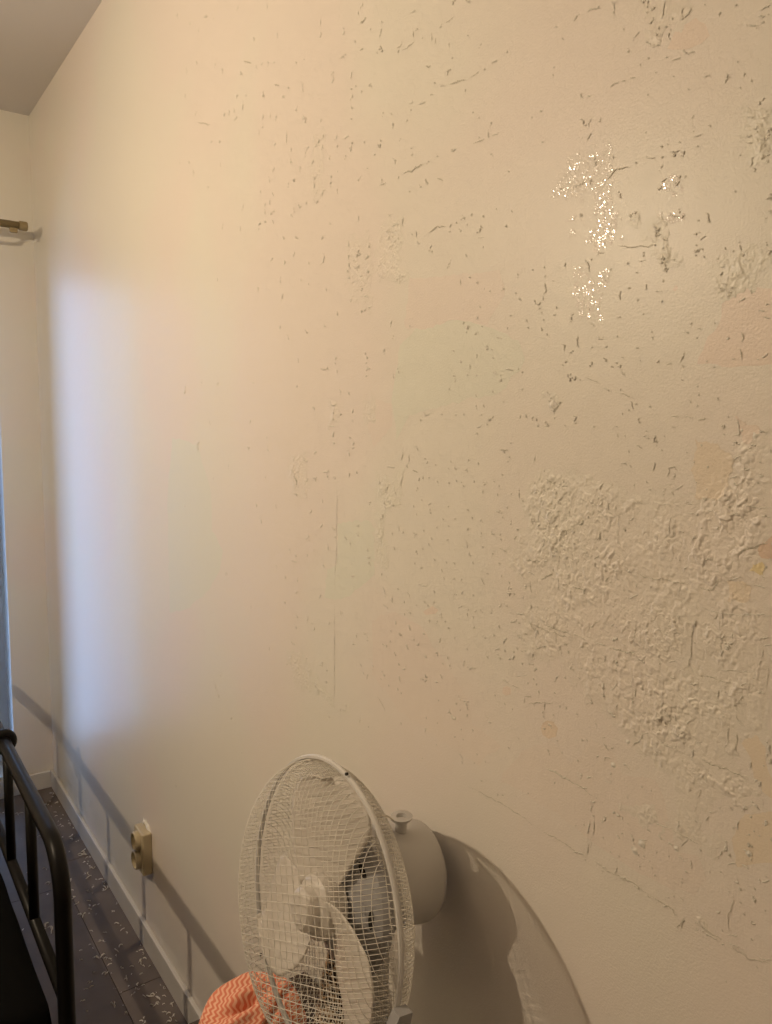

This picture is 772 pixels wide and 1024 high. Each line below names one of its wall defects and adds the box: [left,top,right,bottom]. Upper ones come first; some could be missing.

crack [473,788,768,963]